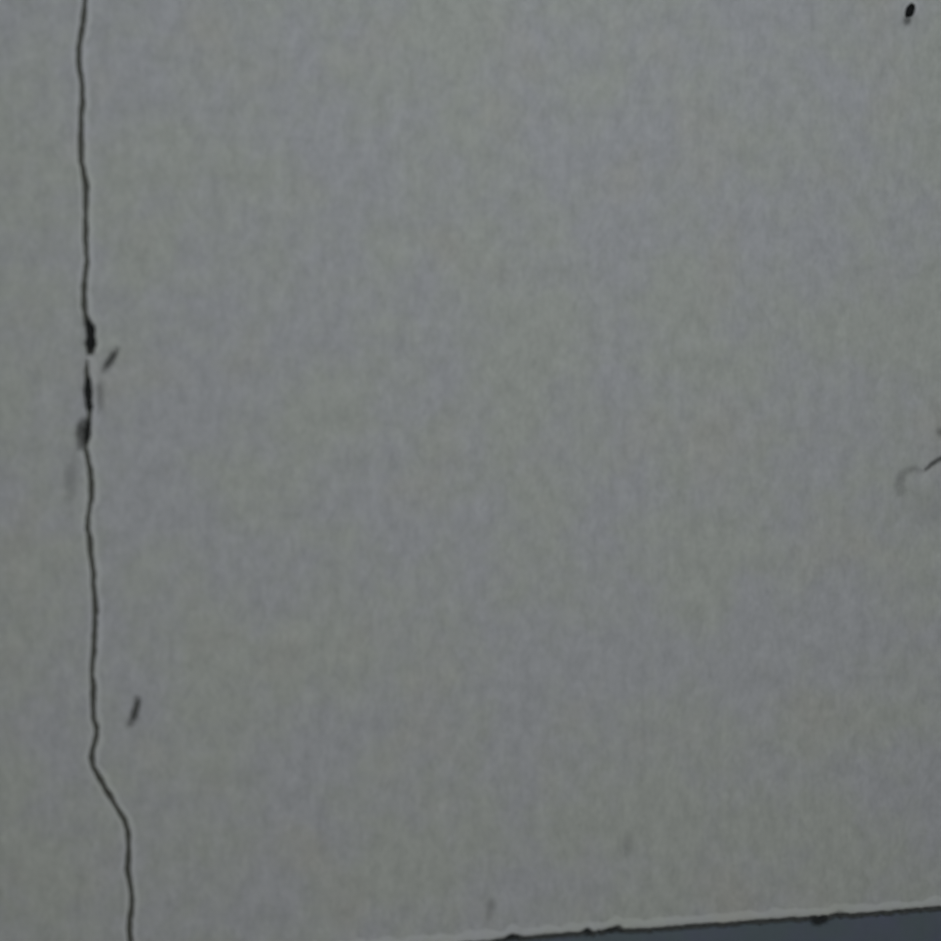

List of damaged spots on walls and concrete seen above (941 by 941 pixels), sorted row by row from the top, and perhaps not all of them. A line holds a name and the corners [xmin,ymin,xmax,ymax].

crack [71,0,139,941]